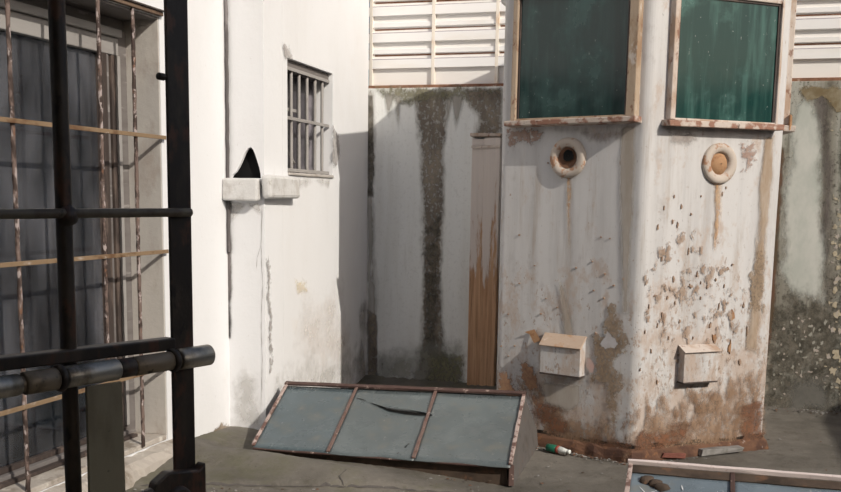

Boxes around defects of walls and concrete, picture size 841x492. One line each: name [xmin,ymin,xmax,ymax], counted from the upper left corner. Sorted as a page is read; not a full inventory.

water stain [367,91,464,383]
peeling [586,297,630,428]
rust [521,372,765,450]
water stain [764,86,841,411]